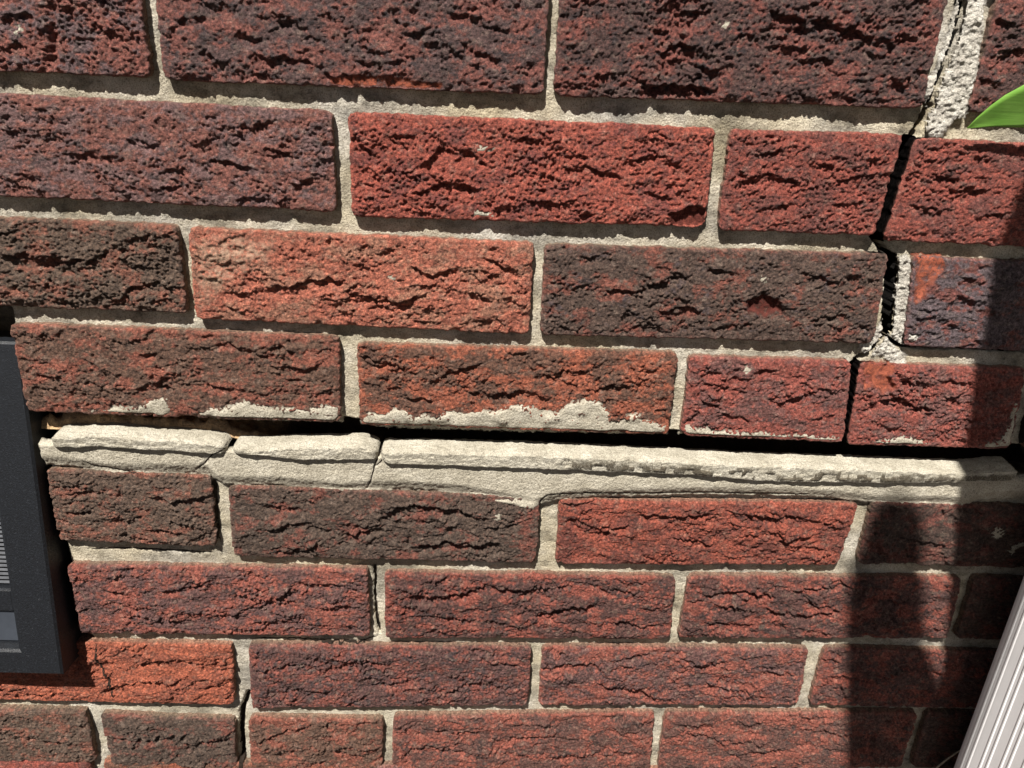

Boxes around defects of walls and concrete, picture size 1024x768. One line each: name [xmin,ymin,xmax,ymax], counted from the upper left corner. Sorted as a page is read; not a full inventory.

crack [913,1,962,126]
crack [869,237,1017,351]
crack [41,412,1024,552]